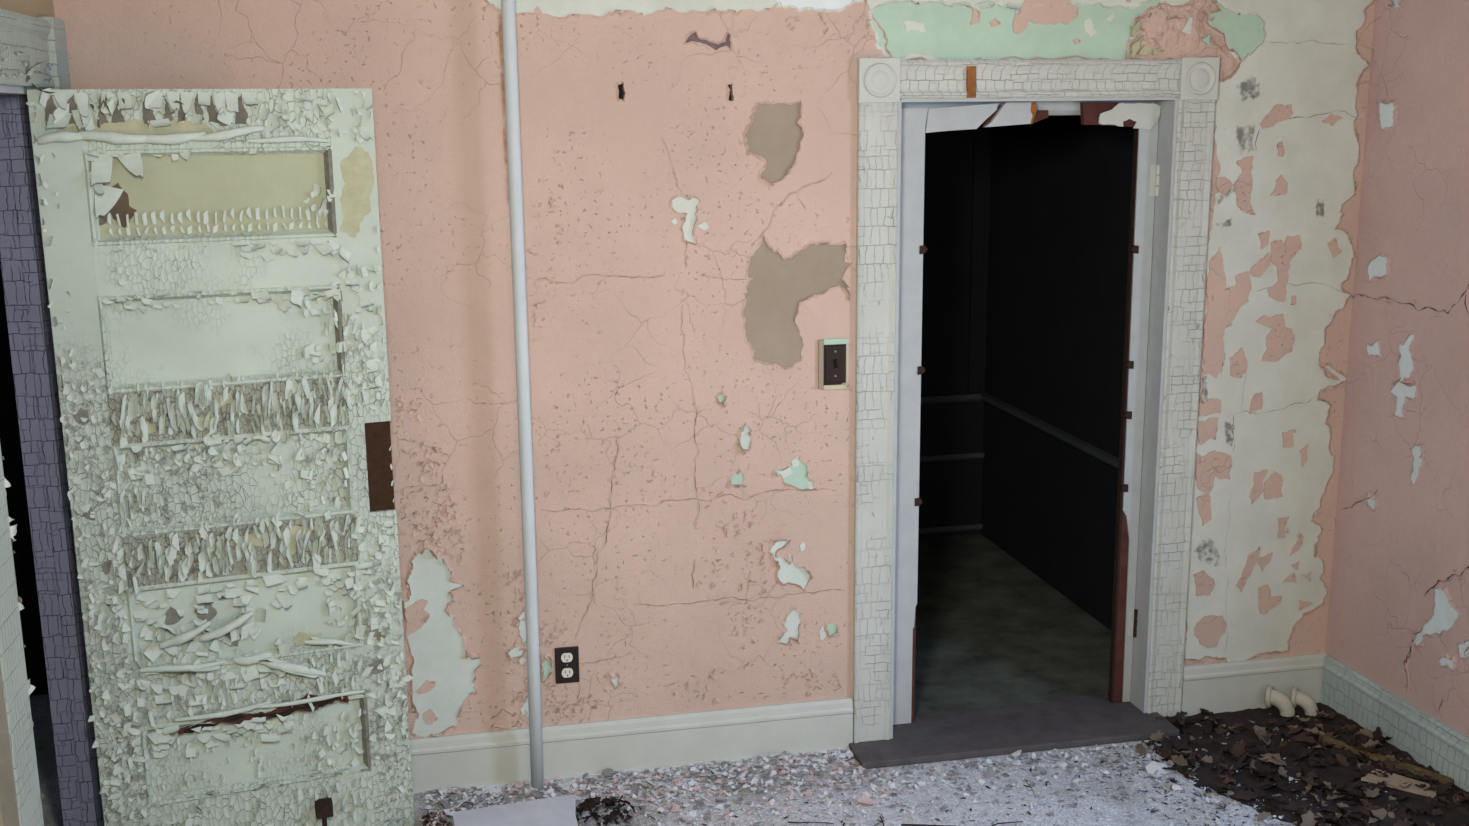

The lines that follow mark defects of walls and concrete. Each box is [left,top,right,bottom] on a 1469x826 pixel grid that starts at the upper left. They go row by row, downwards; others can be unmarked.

peeling [0,56,373,247]
crack [534,172,845,664]
peeling [484,0,1403,664]
crack [1253,282,1469,317]
peeling [1365,331,1419,419]
peeling [47,147,482,826]
peeling [1409,441,1426,486]
peeling [8,516,17,545]
crack [1423,564,1469,597]
peeling [504,612,555,682]
peeling [1411,585,1469,672]